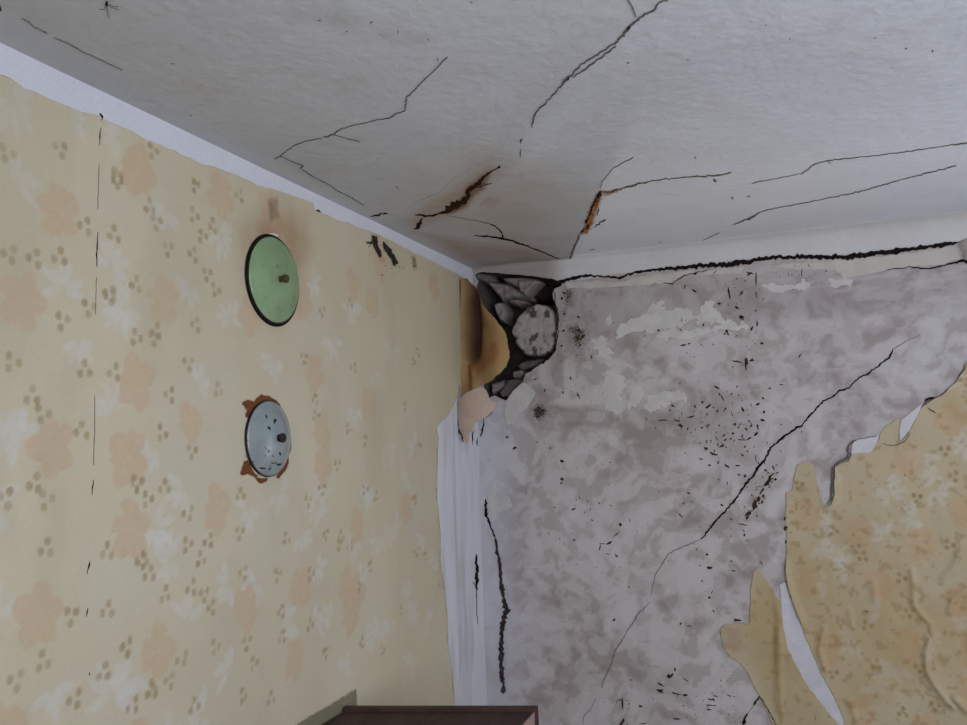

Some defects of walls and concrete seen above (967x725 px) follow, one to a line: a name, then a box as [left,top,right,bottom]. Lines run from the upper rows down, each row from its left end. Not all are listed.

crack [0,7,123,71]
crack [275,56,448,217]
leakage [366,235,398,276]
leakage [347,119,638,268]
crack [413,0,967,286]
peeling [762,238,967,293]
spalling [475,267,749,425]
crack [473,499,511,694]
crack [583,335,920,717]